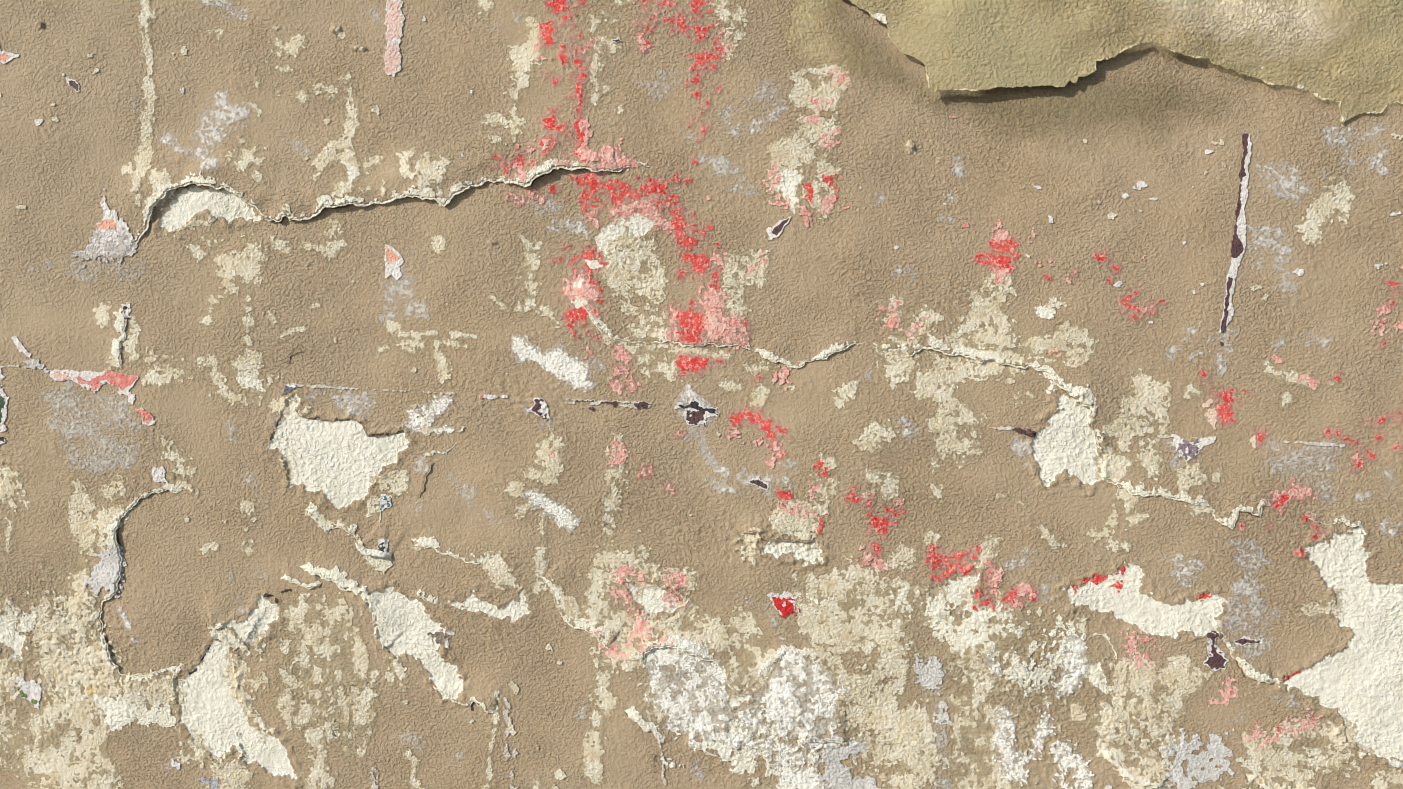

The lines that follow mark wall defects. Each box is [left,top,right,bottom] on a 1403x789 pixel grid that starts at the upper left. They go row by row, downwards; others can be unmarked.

peeling [247,25,351,120]
peeling [221,132,270,185]
peeling [305,119,465,207]
peeling [1121,180,1158,212]
peeling [92,299,115,329]
peeling [134,166,353,344]
peeling [427,233,450,255]
peeling [488,160,798,433]
peeling [117,334,411,540]
peeling [0,470,463,789]